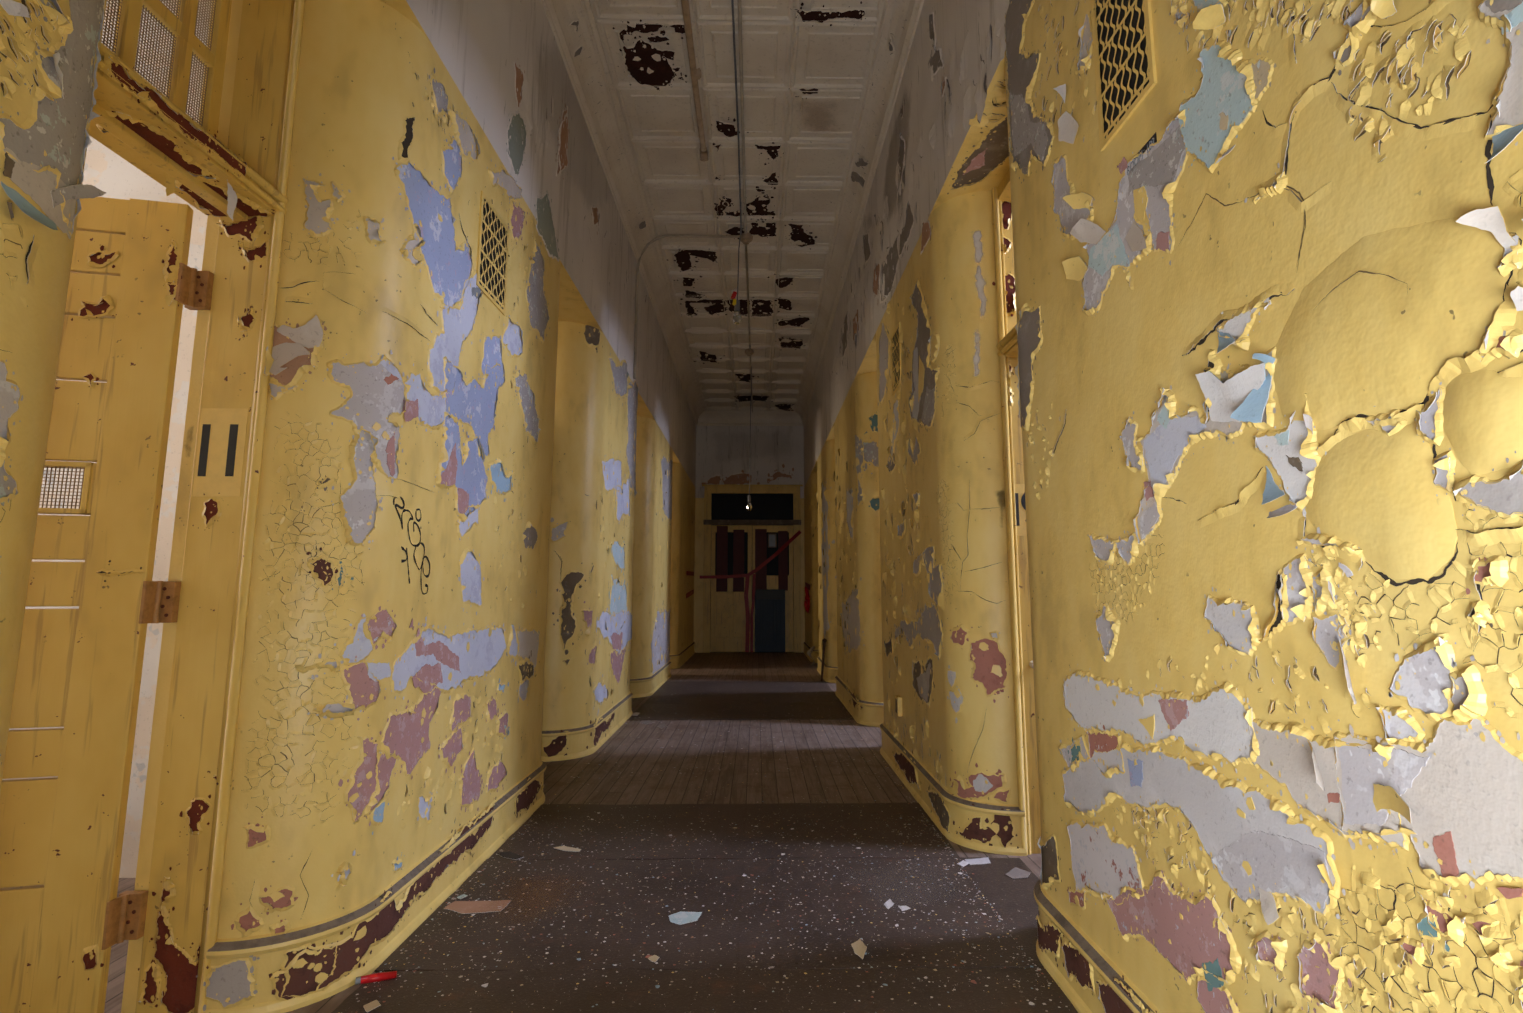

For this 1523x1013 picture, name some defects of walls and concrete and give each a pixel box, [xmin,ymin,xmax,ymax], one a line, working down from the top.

peeling [0,359,23,506]
peeling [0,0,275,269]
peeling [137,51,673,1013]
peeling [613,19,687,91]
peeling [711,117,817,250]
flaking render [816,201,940,656]
flaking render [992,273,1060,500]
peeling [947,0,1523,316]
flaking render [1006,298,1523,1013]
crack [1182,0,1523,720]
peeling [1455,206,1523,365]
crack [1325,854,1523,1013]